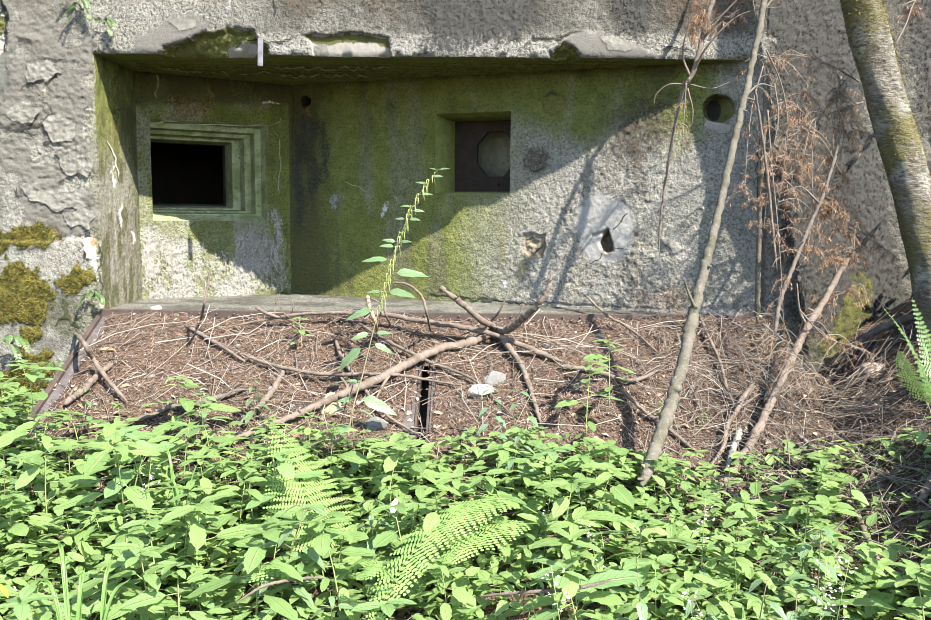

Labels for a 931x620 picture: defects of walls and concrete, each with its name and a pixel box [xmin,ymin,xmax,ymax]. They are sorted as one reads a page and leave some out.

spalling [135,14,268,59]
spalling [303,31,391,58]
peeling [0,1,100,235]
leakage [291,113,341,242]
leakage [118,201,289,300]
spalling [573,191,636,264]